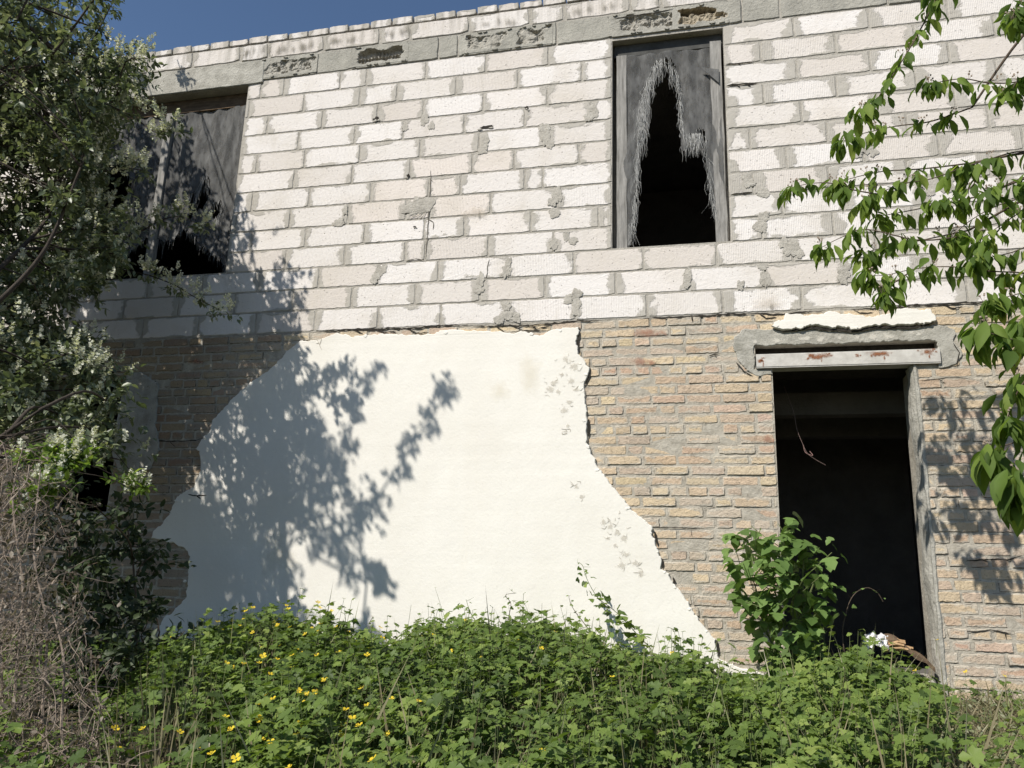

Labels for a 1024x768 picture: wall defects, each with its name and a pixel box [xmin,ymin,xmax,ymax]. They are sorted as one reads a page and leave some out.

spalling [608,1,730,36]
spalling [462,23,553,54]
spalling [350,42,409,68]